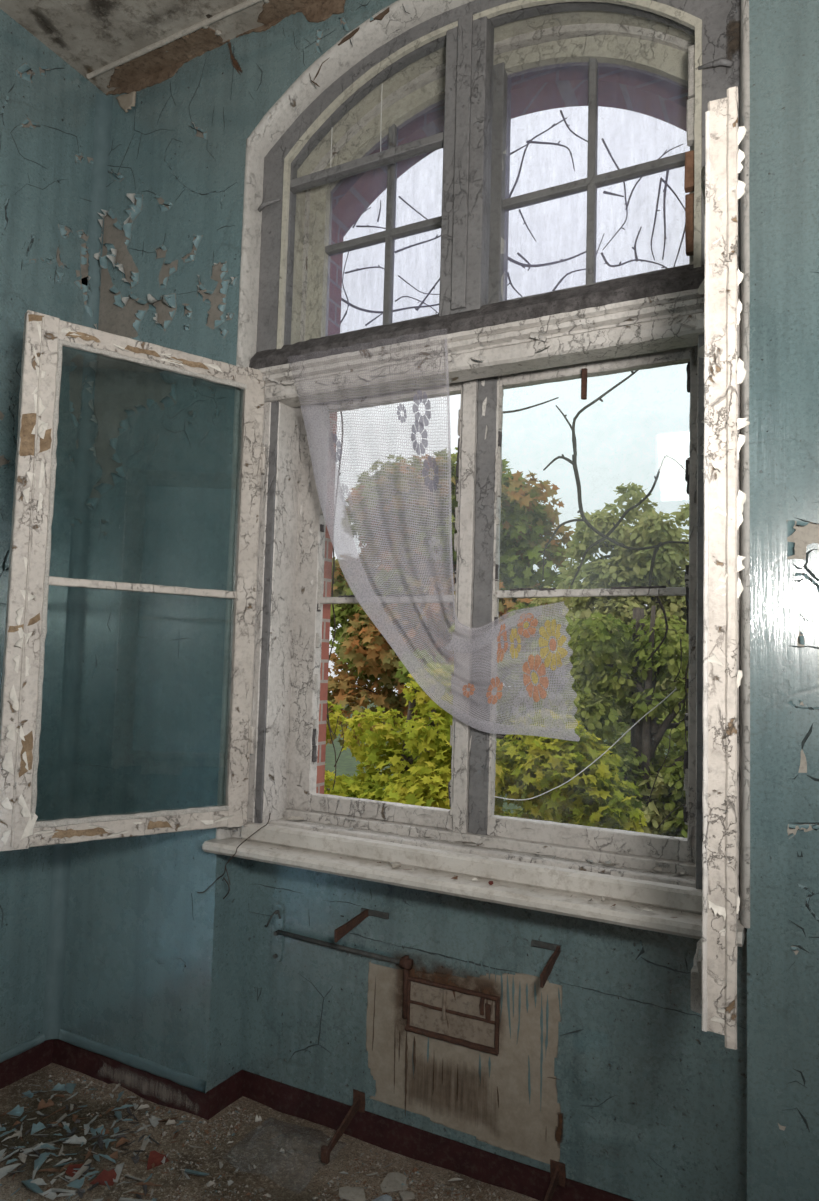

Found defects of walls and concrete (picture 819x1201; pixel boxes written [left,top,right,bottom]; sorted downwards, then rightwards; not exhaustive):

spalling [106,0,410,112]
crack [3,176,66,270]
peeling [10,118,237,341]
peeling [86,353,184,512]
crack [0,548,10,604]
peeling [737,490,747,531]
peeling [787,517,819,581]
peeling [791,613,819,649]
crack [789,851,819,938]
corrosion [397,957,500,1116]
corrosion [555,1113,563,1148]
crack [783,1069,810,1148]